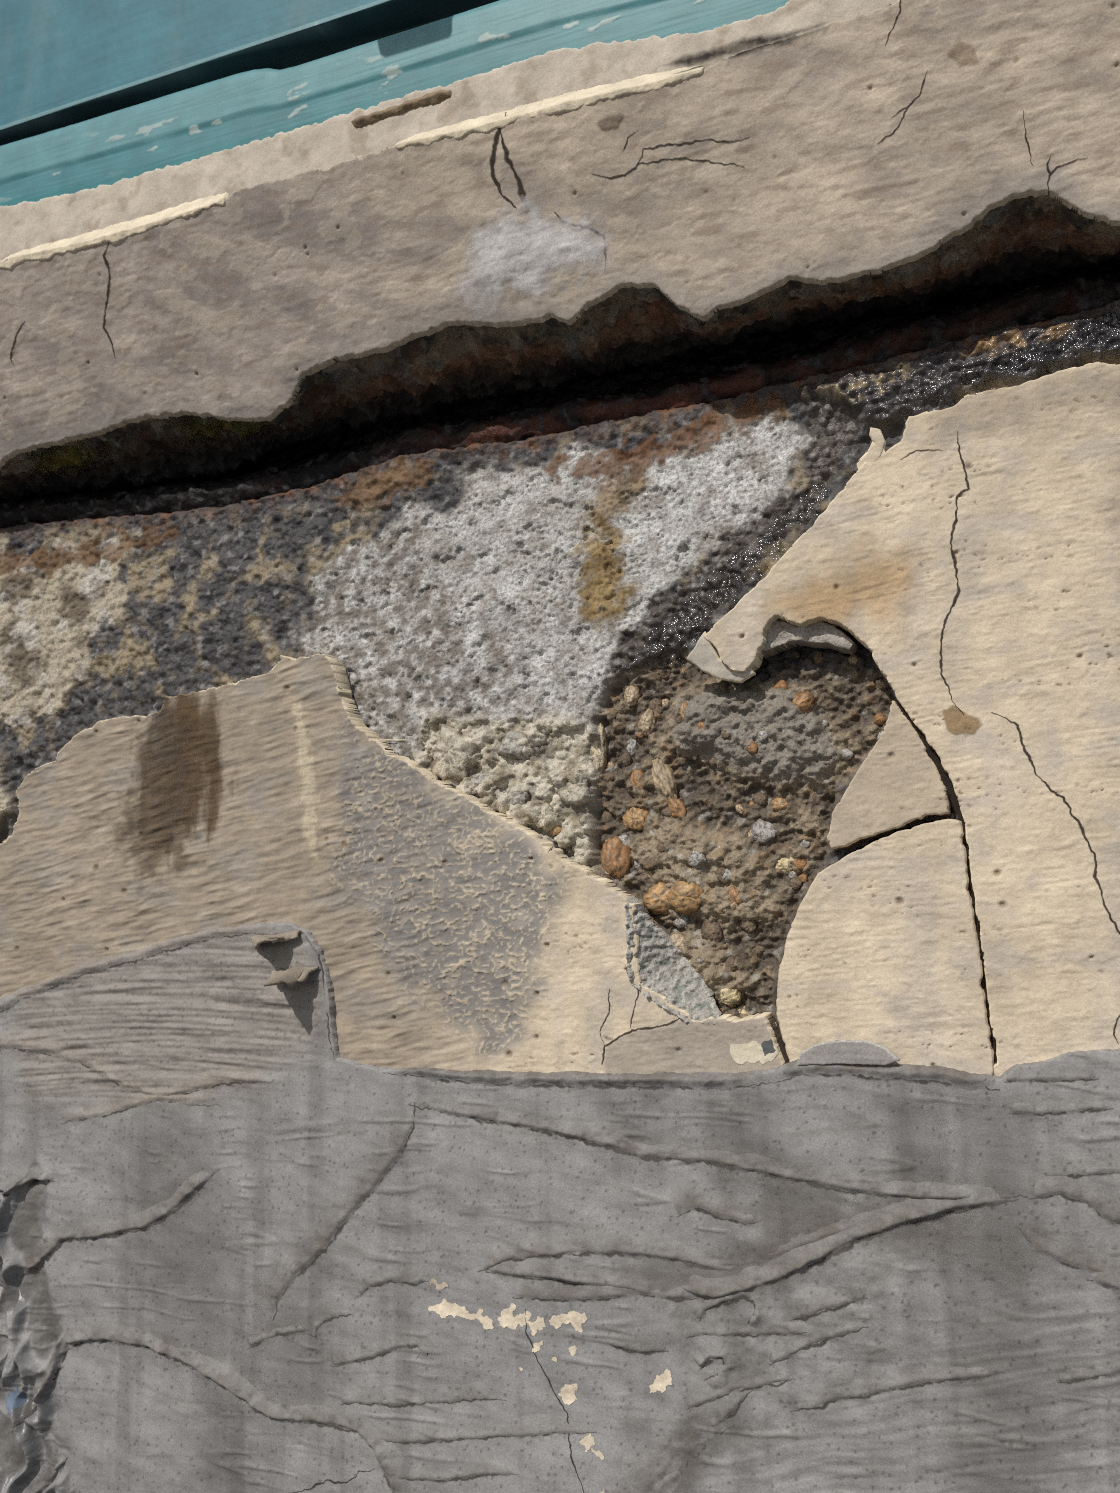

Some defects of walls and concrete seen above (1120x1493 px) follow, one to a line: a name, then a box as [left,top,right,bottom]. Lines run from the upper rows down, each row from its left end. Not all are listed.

crack [671,24,821,66]
crack [490,112,606,272]
spalling [0,191,1120,502]
corrosion [334,455,435,509]
corrosion [545,393,784,619]
spalling [0,300,1120,1064]
crack [900,431,1120,934]
water stain [118,716,186,871]
crack [830,698,997,1062]
crack [768,1016,789,1064]
peeling [428,1278,587,1362]
peeling [649,1369,672,1393]